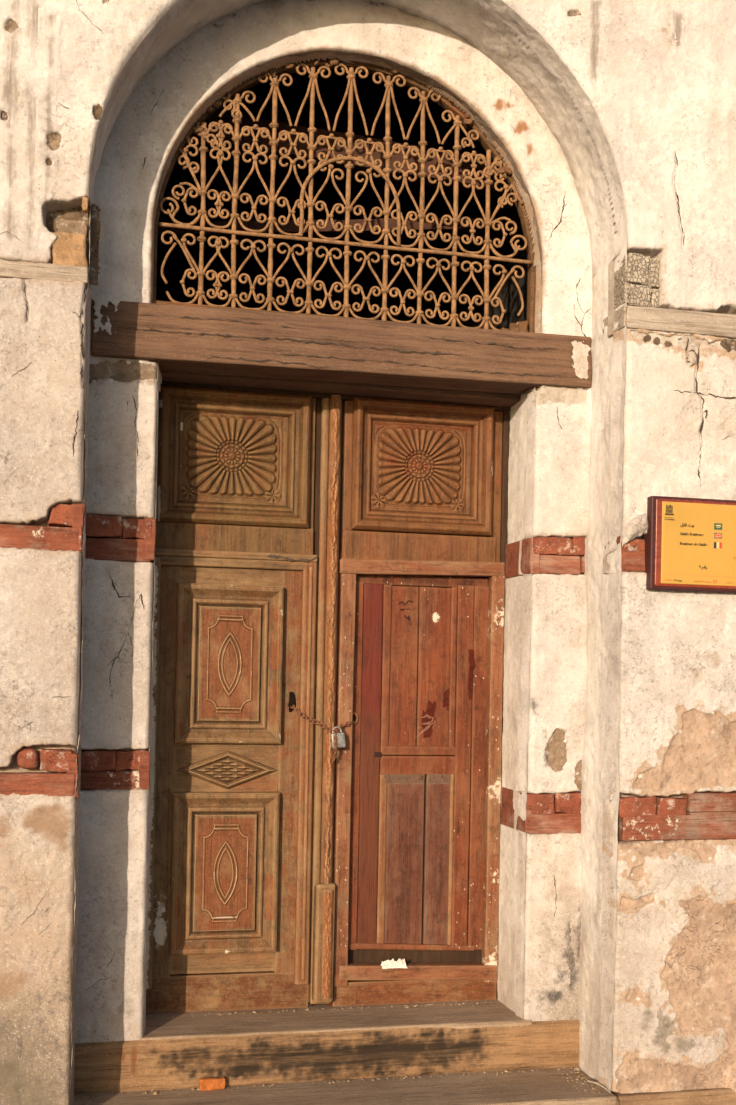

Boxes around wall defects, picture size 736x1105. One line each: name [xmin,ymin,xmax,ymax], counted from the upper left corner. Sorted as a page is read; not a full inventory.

leakage [0,0,62,260]
crack [674,153,685,245]
crack [674,338,736,481]
crack [108,577,144,700]
flaking render [545,729,582,791]
flaking render [632,709,736,793]
leakage [0,796,77,860]
flaking render [620,889,656,909]
flaking render [618,839,736,880]
leakage [0,957,73,1105]
flaking render [615,896,736,1094]